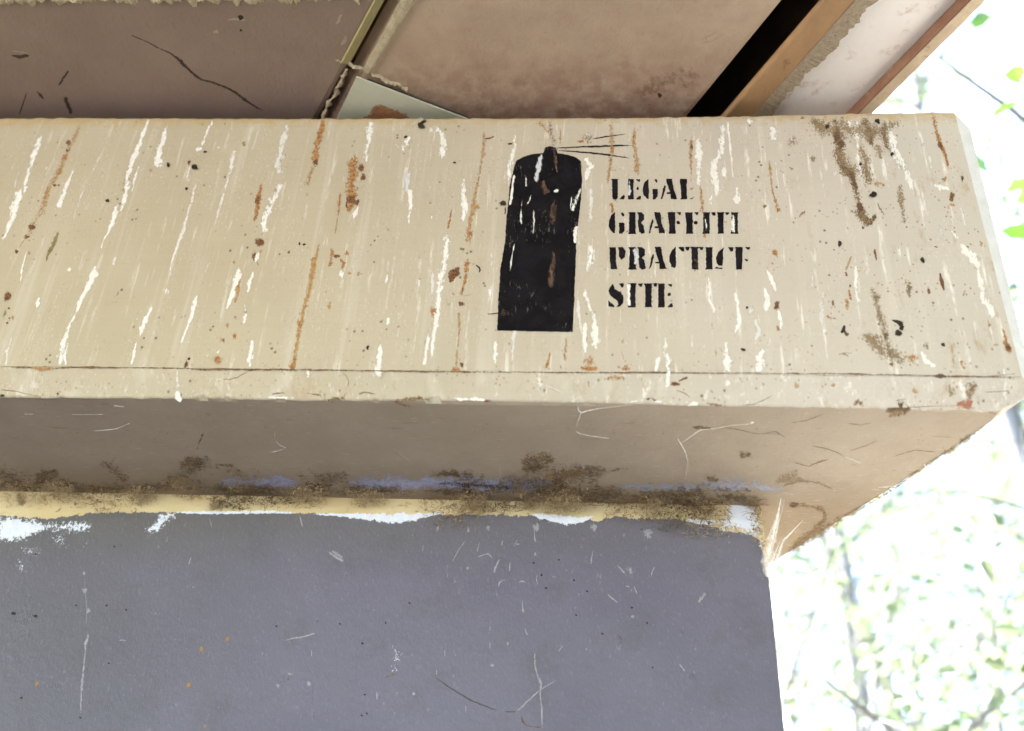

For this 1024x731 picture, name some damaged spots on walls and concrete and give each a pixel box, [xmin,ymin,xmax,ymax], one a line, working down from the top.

crack [131,35,263,111]
rust [15,128,79,254]
rust [253,184,262,221]
rust [305,119,325,196]
rust [335,155,360,232]
rust [465,125,494,241]
water stain [816,119,914,222]
rust [288,243,362,372]
rust [448,259,471,372]